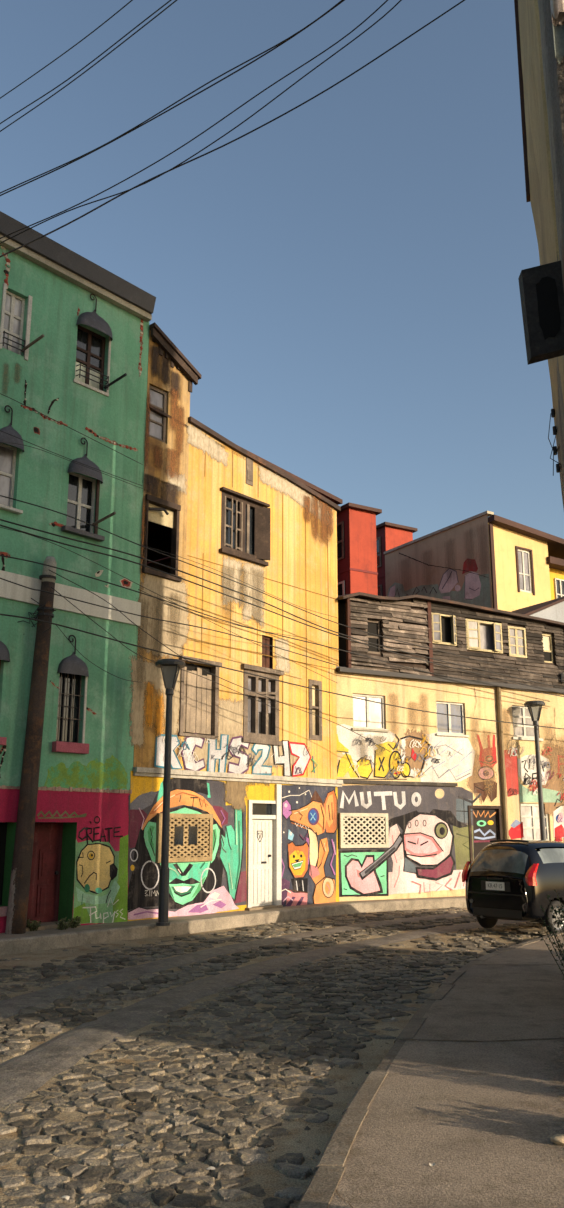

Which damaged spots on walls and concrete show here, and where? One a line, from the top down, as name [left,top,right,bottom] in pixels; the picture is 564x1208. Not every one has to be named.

corrosion [145,389,184,478]